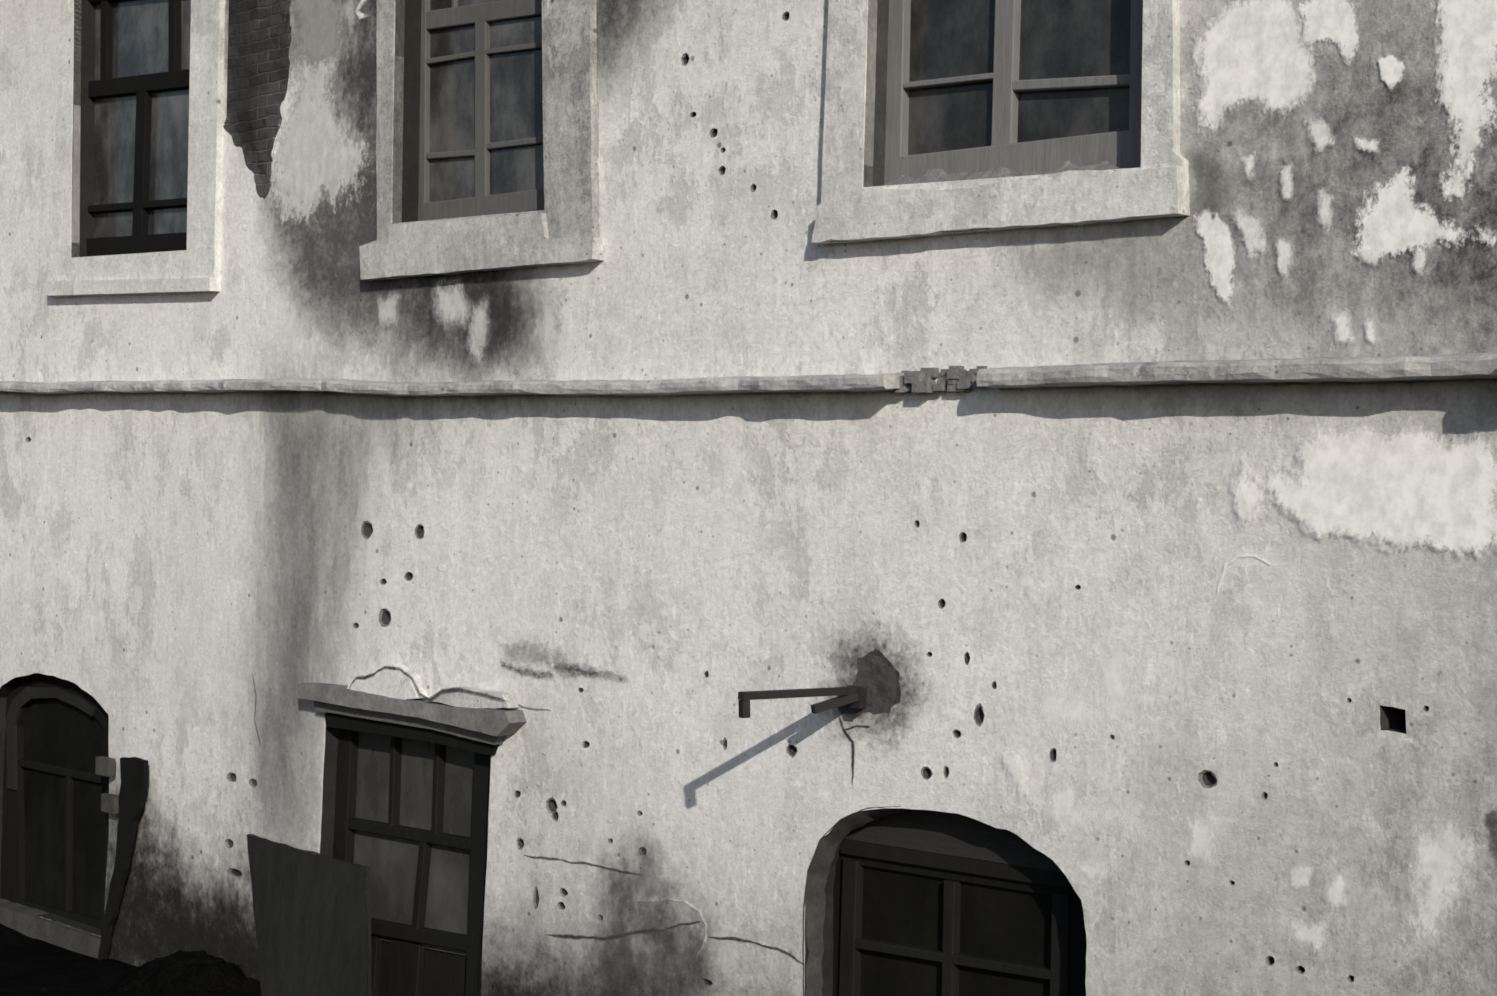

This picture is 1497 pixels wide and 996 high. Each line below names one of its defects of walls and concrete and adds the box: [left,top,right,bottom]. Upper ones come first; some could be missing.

spalling [223,0,369,225]
damp [272,0,558,374]
peeling [1193,0,1359,131]
peeling [1350,0,1497,259]
peeling [1193,211,1235,305]
peeling [1231,425,1497,557]
crack [349,645,622,710]
crack [839,718,870,785]
spalling [837,650,901,722]
crack [524,855,637,875]
damp [596,854,704,996]
crack [548,921,804,965]